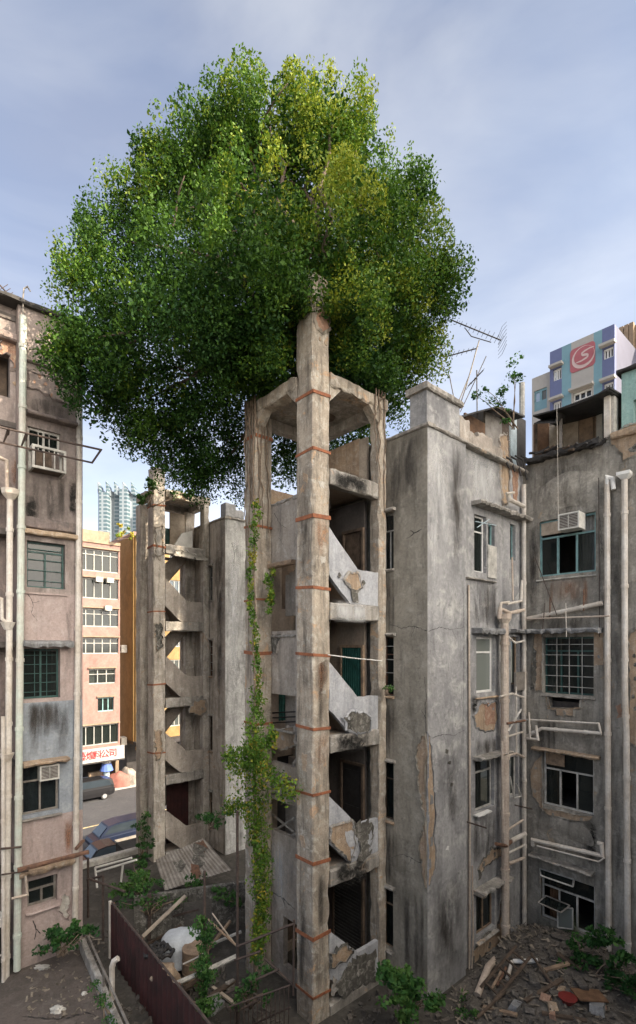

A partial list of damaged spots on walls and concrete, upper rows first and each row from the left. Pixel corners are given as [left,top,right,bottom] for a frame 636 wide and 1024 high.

peeling [338,570,365,603]
crack [393,593,464,774]
peeling [472,700,499,733]
peeling [415,731,449,890]
peeling [328,818,358,864]
peeling [329,942,377,1000]